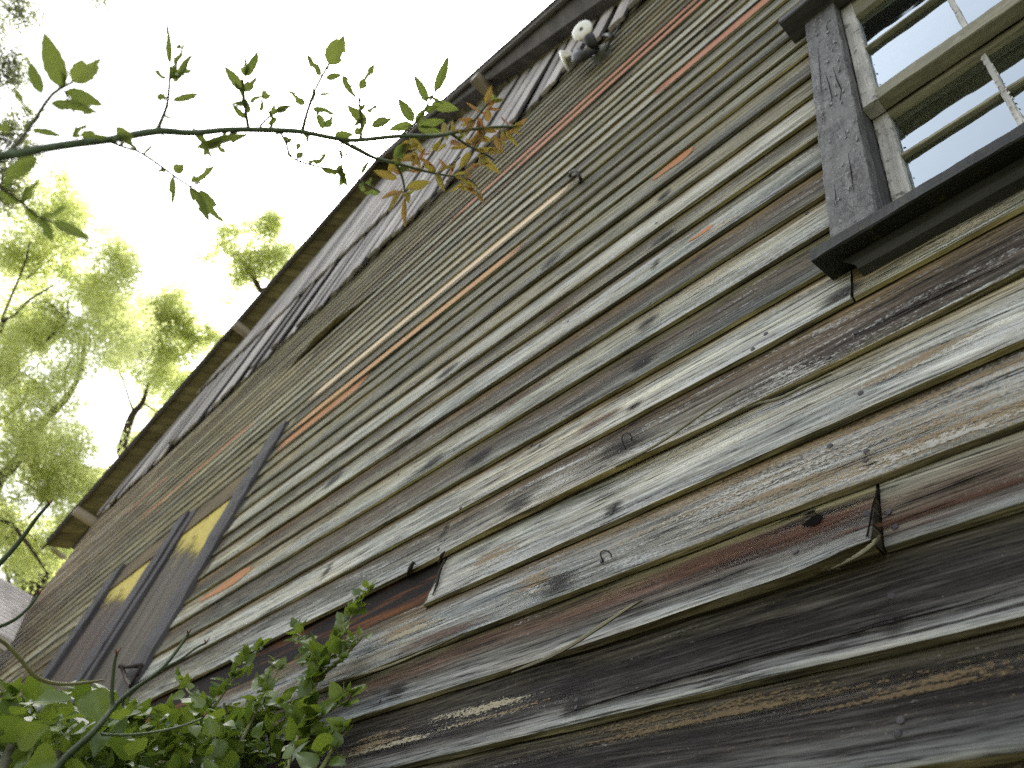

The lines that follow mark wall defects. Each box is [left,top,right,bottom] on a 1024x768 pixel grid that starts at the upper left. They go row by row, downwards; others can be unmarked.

crack [796,428,1018,537]